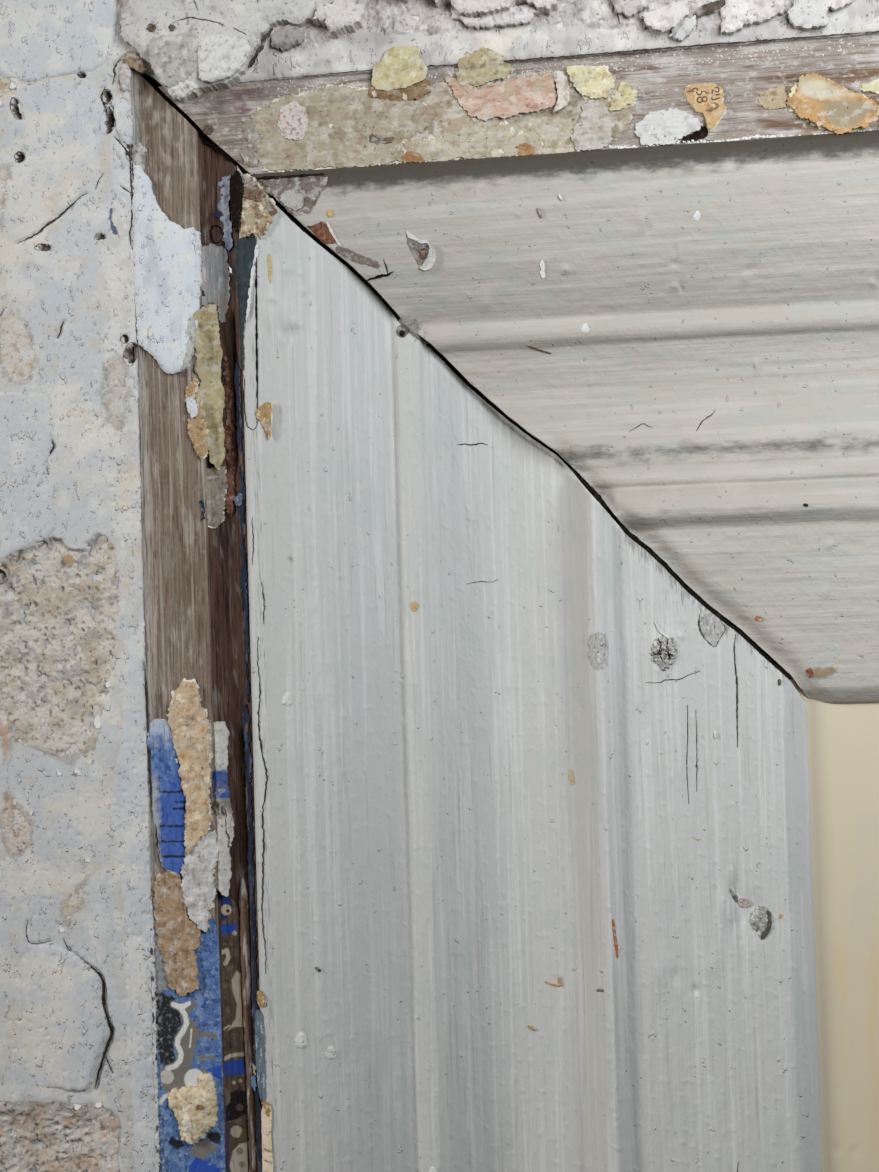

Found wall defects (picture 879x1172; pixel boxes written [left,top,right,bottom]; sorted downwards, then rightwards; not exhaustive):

flaking render [248,25,275,68]
flaking render [296,0,853,49]
flaking render [571,100,615,152]
peeling [180,316,197,371]